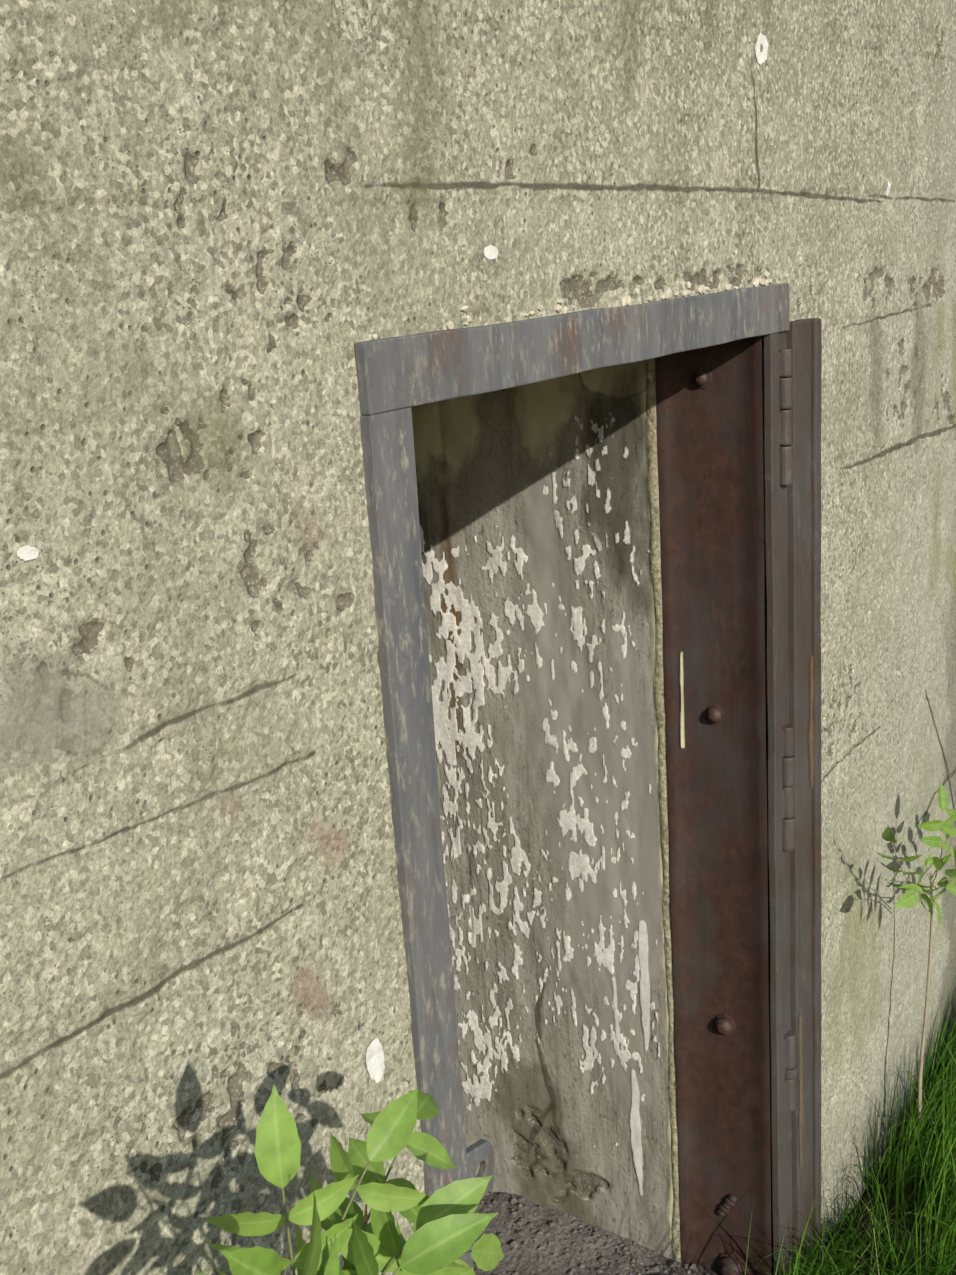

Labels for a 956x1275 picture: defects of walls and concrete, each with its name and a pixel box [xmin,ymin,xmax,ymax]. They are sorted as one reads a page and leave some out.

crack [365,71,955,203]
crack [843,424,956,468]
crack [63,669,109,691]
crack [3,751,315,878]
crack [126,674,296,748]
peeling [420,413,666,1111]
crack [0,904,303,1079]